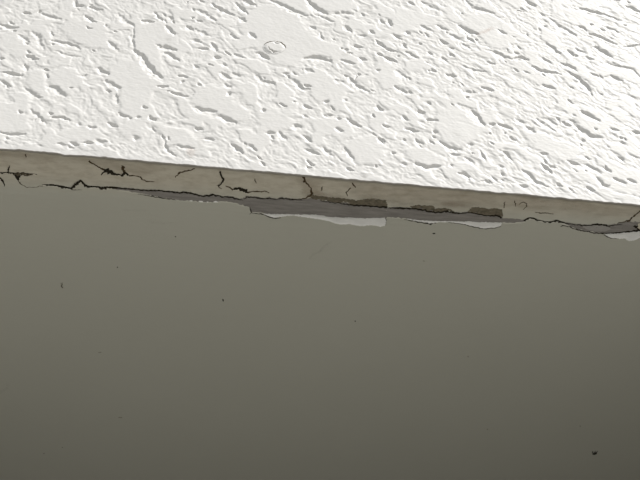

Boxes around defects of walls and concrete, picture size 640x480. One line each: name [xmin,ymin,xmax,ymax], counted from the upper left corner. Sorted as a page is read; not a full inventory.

crack [0,154,154,190]
crack [218,171,269,193]
crack [302,177,323,199]
peeling [112,187,525,229]
crack [504,201,564,223]
peeling [558,221,640,241]